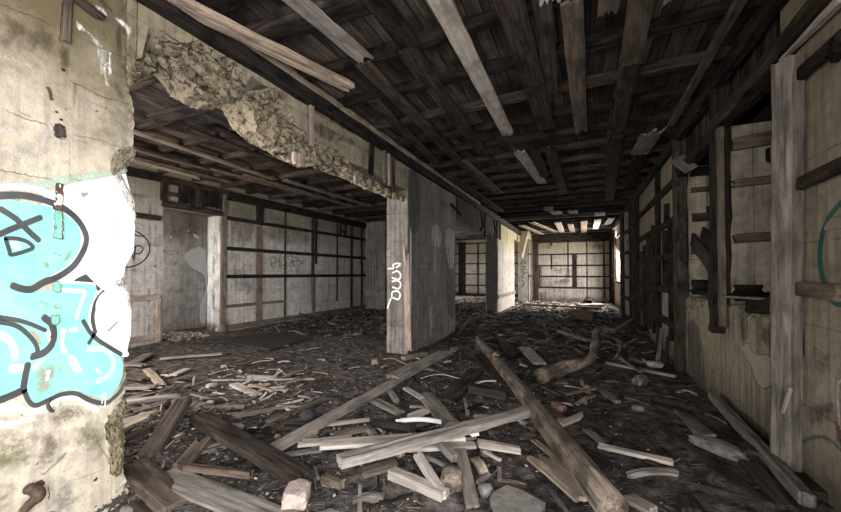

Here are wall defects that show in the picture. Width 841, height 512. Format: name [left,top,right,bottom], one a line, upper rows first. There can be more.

spalling [126,28,405,202]
rust [53,183,64,240]